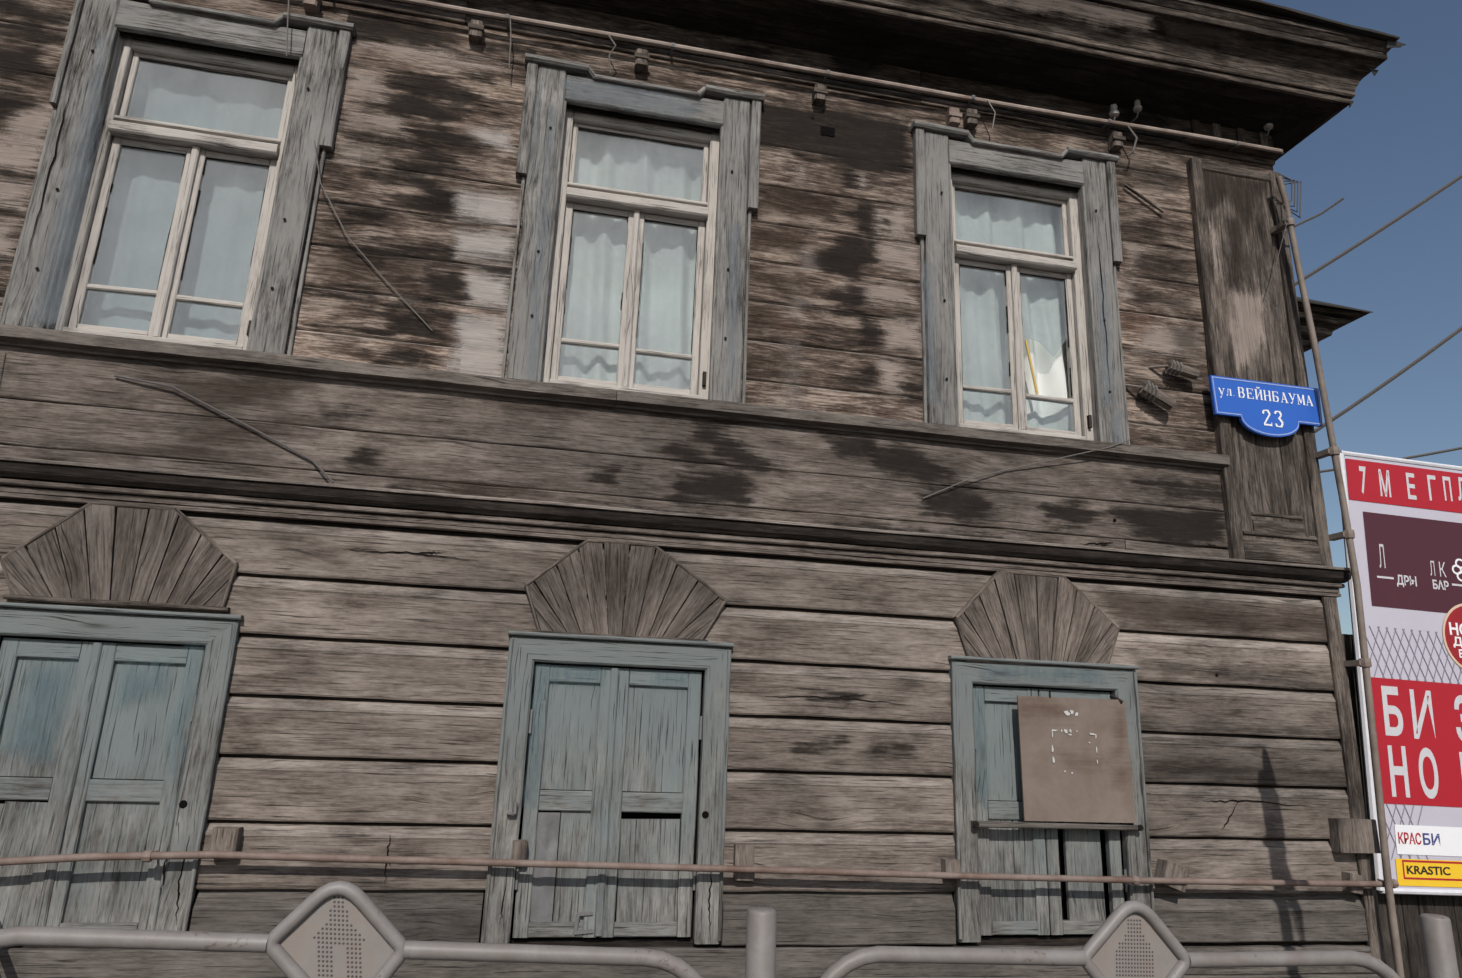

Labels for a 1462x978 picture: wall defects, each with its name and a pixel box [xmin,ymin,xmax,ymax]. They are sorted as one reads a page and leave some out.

leakage [0,0,72,118]
leakage [347,10,459,48]
leakage [482,40,536,56]
leakage [0,169,35,217]
leakage [303,69,513,369]
leakage [750,96,919,350]
leakage [829,367,878,393]
leakage [897,381,923,398]
leakage [345,447,383,465]
leakage [387,420,785,526]
leakage [819,431,1003,538]